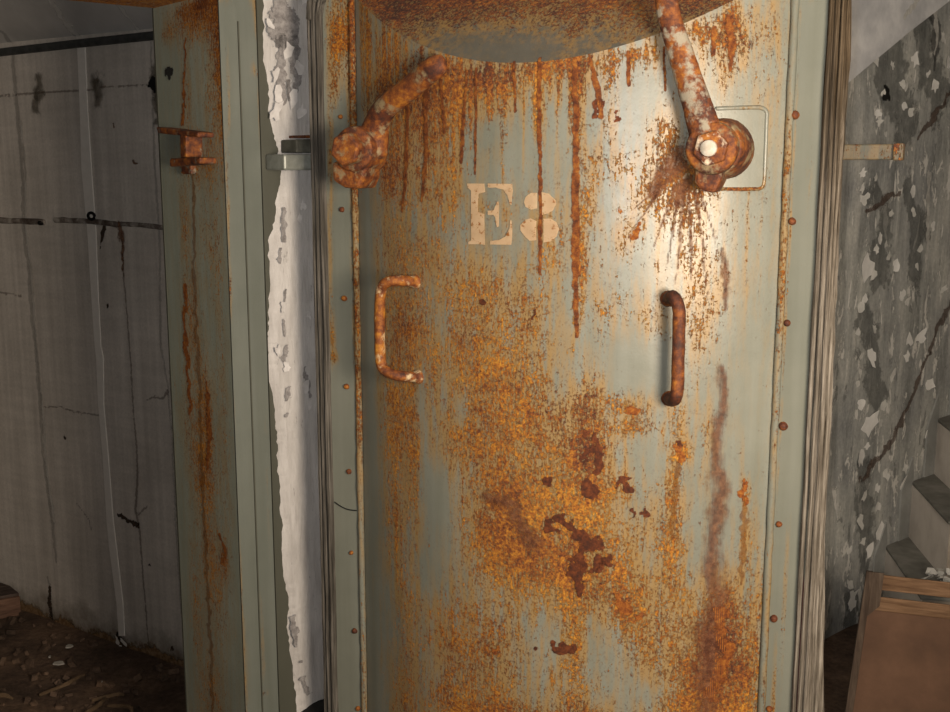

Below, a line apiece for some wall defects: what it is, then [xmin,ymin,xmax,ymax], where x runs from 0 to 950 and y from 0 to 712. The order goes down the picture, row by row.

flaking render [263,0,311,154]
corrosion [459,67,478,175]
corrosion [589,58,621,122]
corrosion [711,15,737,71]
corrosion [570,57,581,338]
corrosion [628,222,641,240]
flaking render [268,170,324,712]
corrosion [579,429,605,500]
corrosion [615,476,635,493]
crack [117,513,140,528]
corrosion [544,513,613,597]
corrosion [550,640,577,655]